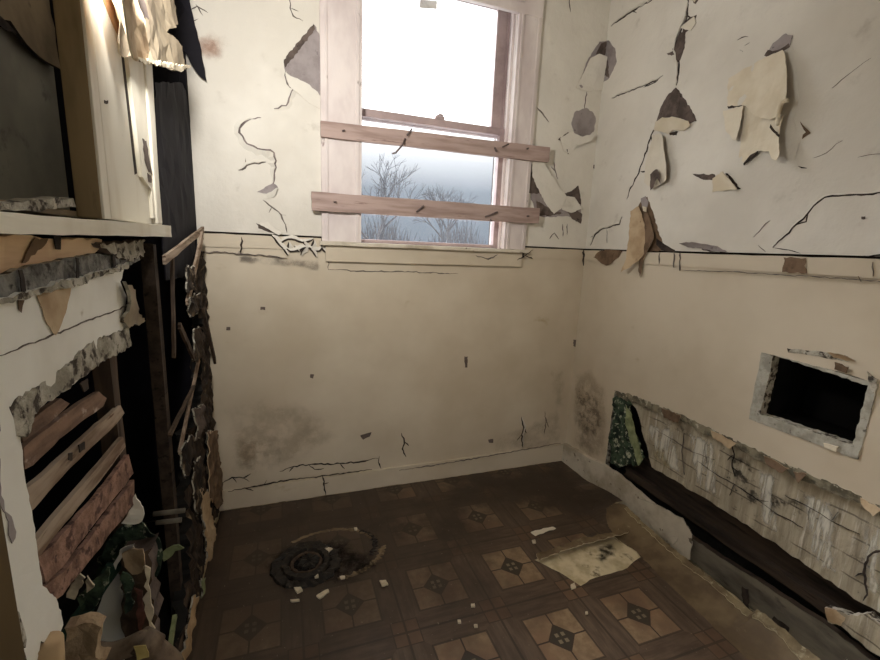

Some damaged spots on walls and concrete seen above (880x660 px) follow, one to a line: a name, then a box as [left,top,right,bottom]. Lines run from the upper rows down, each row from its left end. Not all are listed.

crack [234,72,296,232]
peeling [284,24,320,109]
crack [611,0,697,98]
flaking render [654,88,697,135]
peeling [723,33,810,165]
peeling [594,196,727,276]
crack [756,190,880,253]
flaking render [0,238,146,335]
crack [223,417,560,495]
spalling [608,391,880,613]
crack [654,428,860,535]
crack [856,550,880,601]